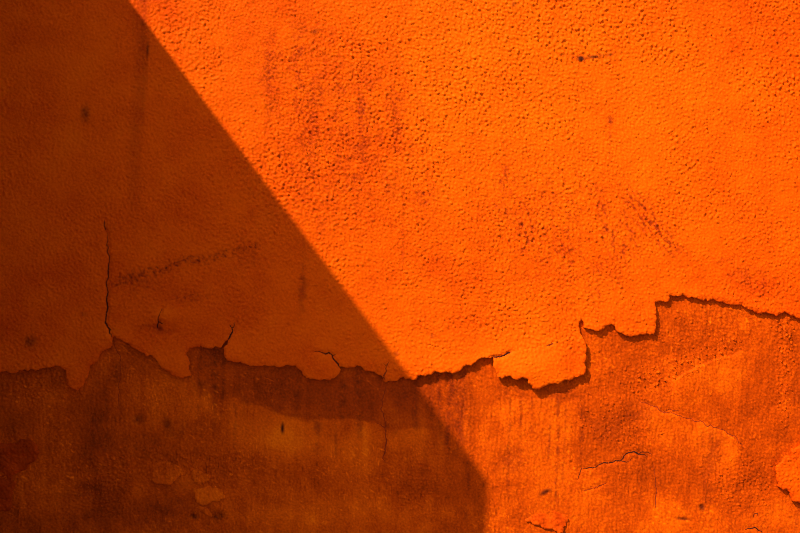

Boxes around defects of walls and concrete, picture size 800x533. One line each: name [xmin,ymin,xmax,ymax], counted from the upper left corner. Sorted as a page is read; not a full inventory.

crack [104,221,121,408]
peeling [0,295,800,533]
crack [578,451,657,508]